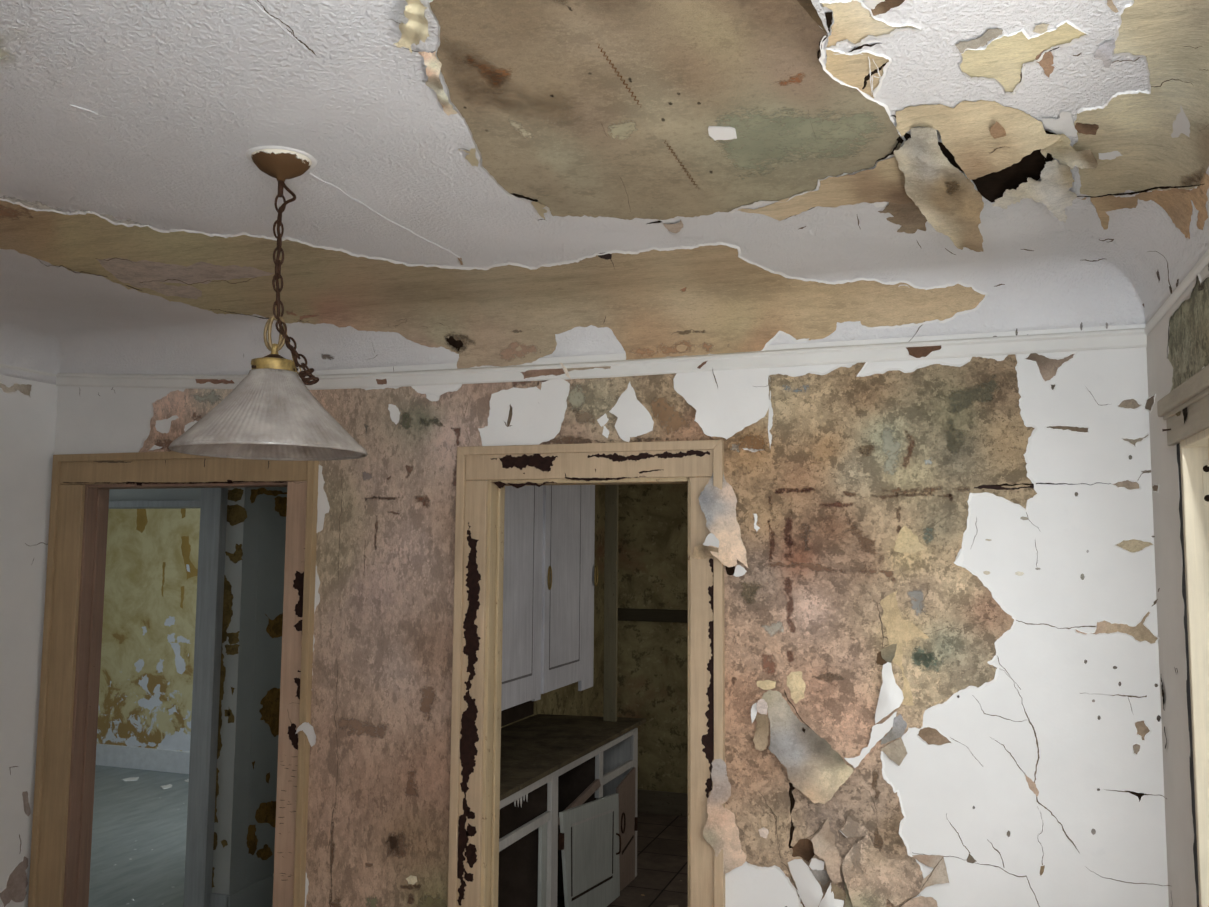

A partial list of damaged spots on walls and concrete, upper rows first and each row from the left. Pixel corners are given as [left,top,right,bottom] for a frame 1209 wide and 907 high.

crack [251,0,316,58]
peeling [819,0,922,98]
peeling [955,20,1089,95]
peeling [1073,0,1209,198]
peeling [739,127,984,252]
peeling [521,366,611,379]
peeling [906,345,941,358]
peeling [457,522,481,906]
peeling [692,474,748,874]
peeling [751,644,954,907]
crack [912,656,1178,907]
crack [1016,588,1160,645]